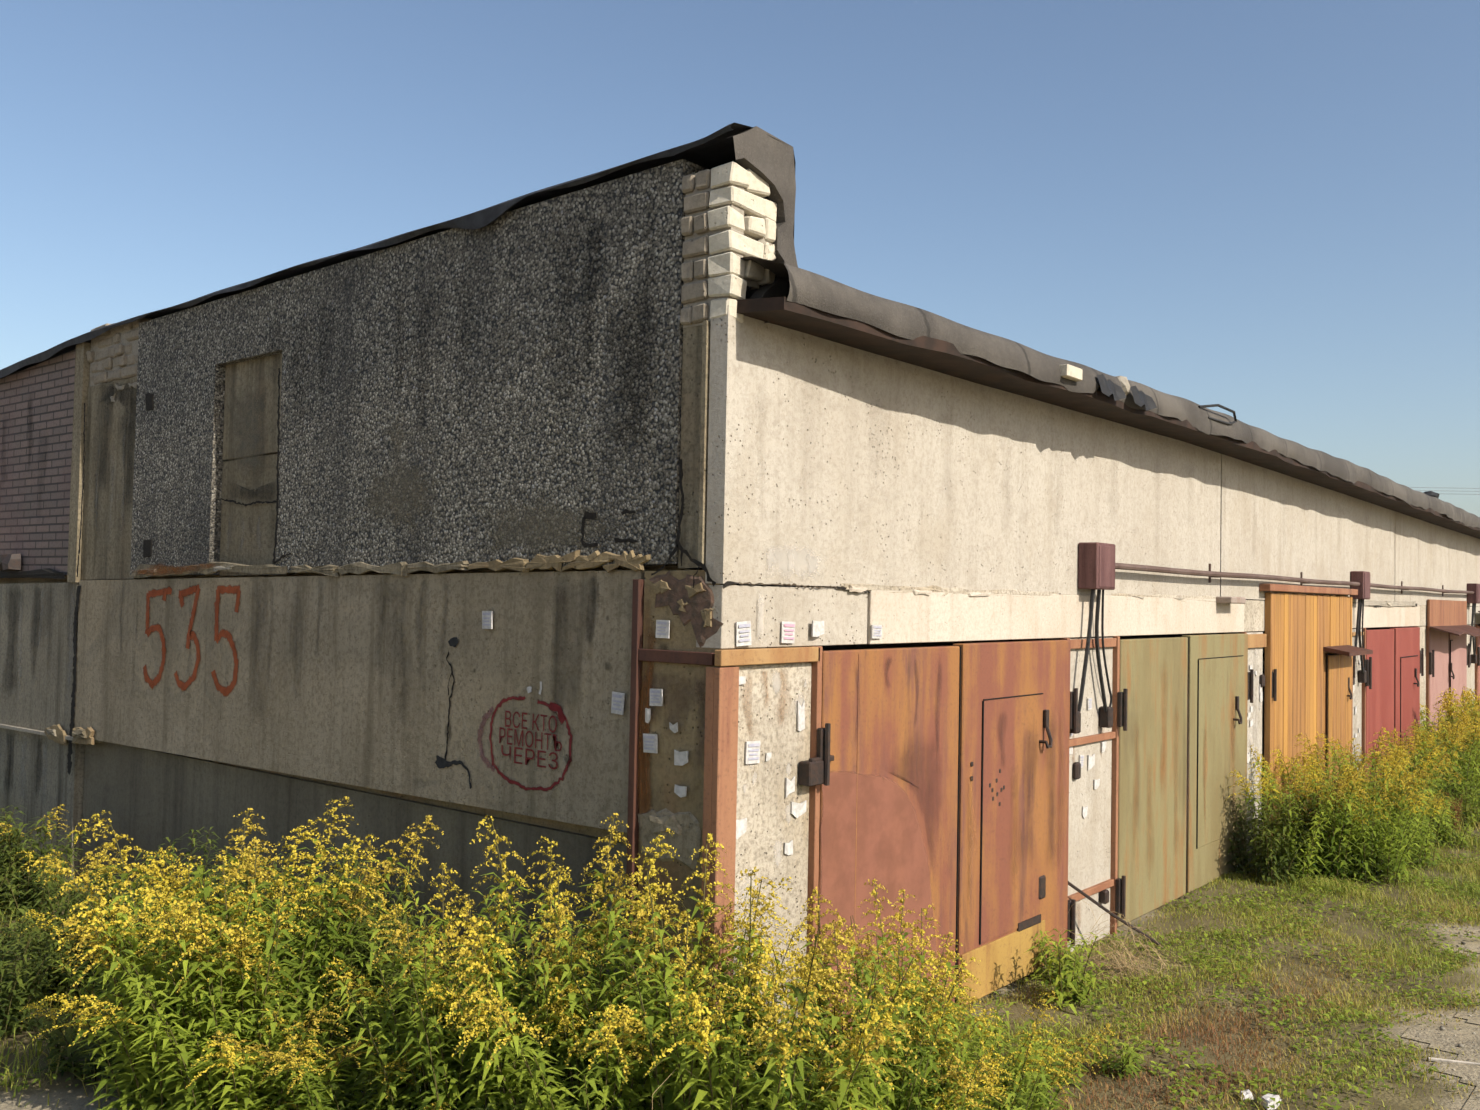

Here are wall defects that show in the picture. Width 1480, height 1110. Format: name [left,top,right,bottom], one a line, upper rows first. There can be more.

rust [818,771,938,1025]